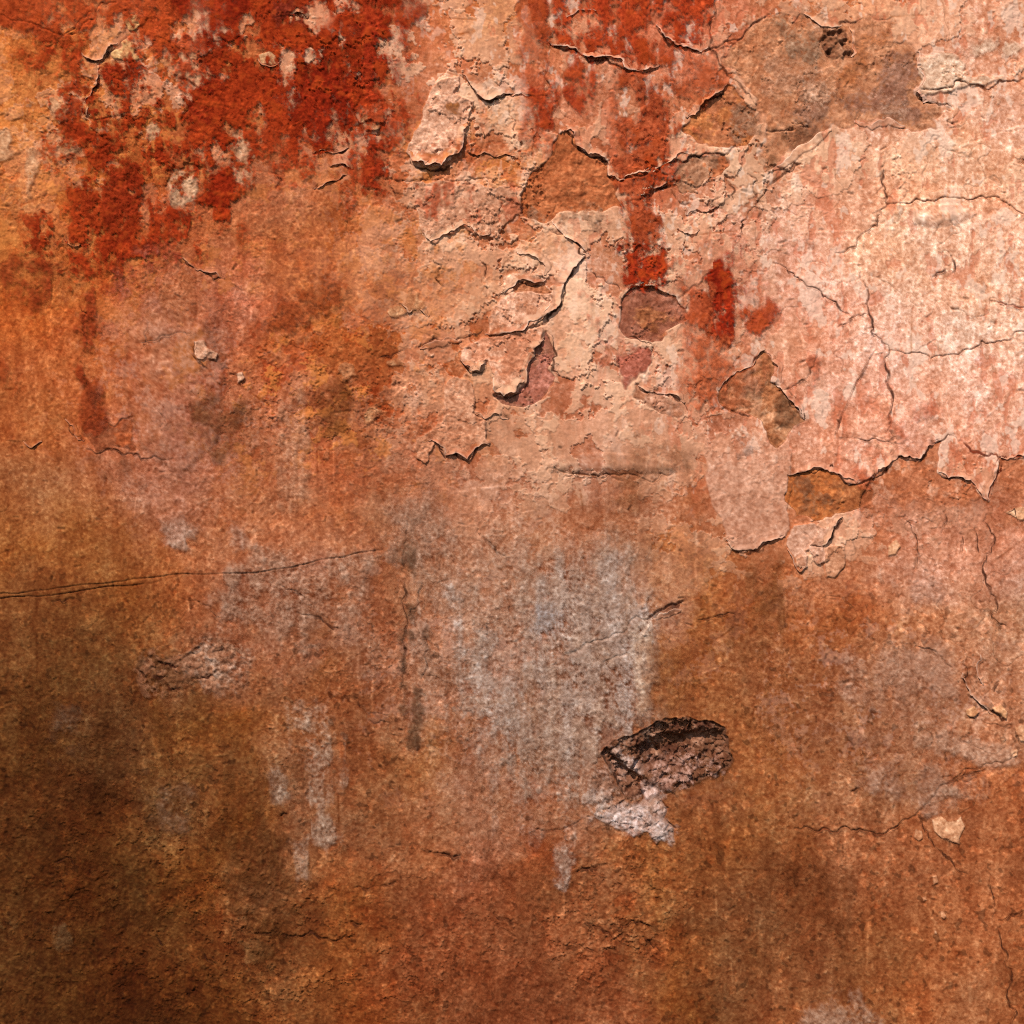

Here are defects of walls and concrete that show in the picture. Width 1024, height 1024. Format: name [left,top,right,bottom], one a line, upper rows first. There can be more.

rust [0,0,420,436]
rust [528,0,724,293]
peeling [388,2,1021,463]
crack [843,170,1024,253]
peeling [365,407,380,423]
rust [681,245,780,408]
crack [783,266,922,442]
crack [955,302,1024,355]
peeling [726,434,1024,577]
damp [460,630,524,736]
damp [513,547,657,761]
spalling [581,717,733,843]